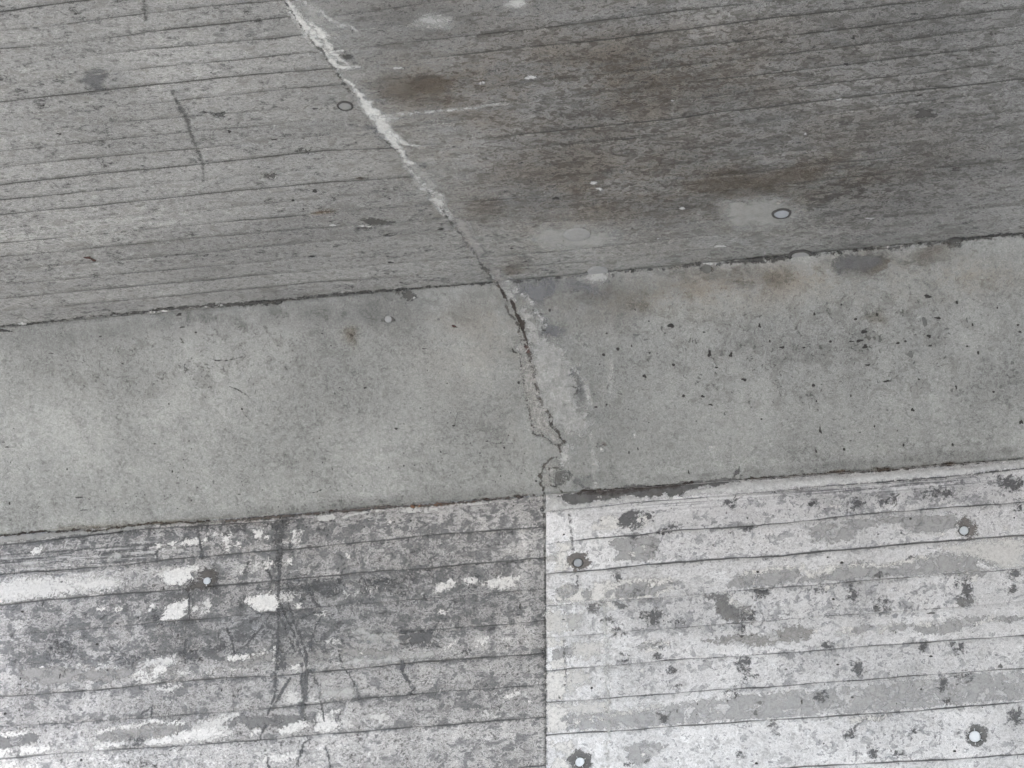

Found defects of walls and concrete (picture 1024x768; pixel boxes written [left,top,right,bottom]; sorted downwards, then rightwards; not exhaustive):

crack [286,4,354,94]
damp [286,0,484,257]
crack [384,138,574,764]
peeling [0,544,130,613]
peeling [158,562,201,587]
peeling [148,598,214,623]
peeling [149,527,305,575]
peeling [242,590,302,612]
peeling [421,573,521,597]
spalling [542,460,782,562]
peeling [503,541,1024,768]
peeling [0,687,392,768]